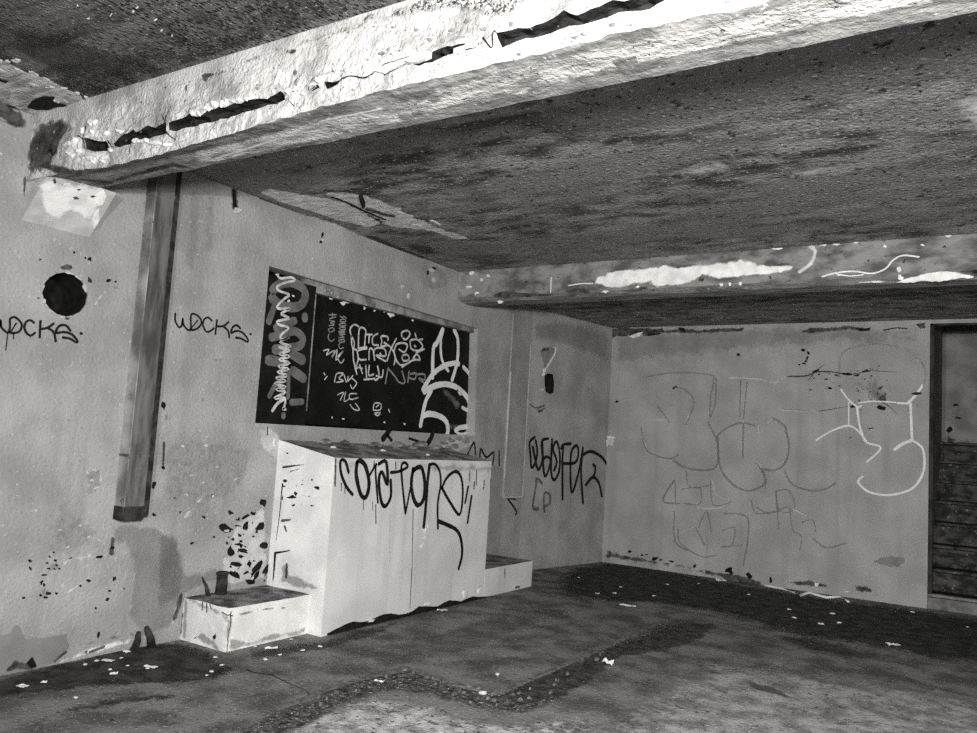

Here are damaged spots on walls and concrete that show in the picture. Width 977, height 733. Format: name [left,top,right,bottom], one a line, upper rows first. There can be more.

peeling [0,58,89,116]
crack [77,0,665,153]
peeling [595,260,793,293]